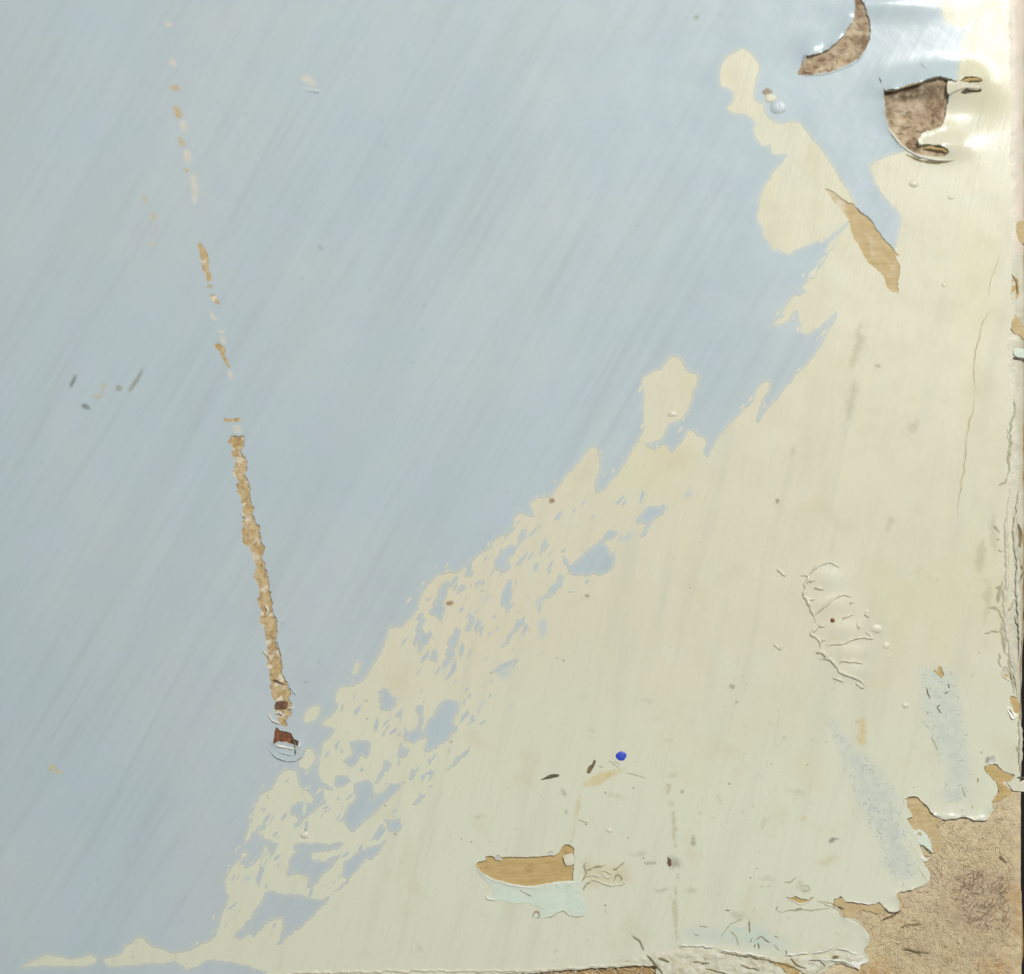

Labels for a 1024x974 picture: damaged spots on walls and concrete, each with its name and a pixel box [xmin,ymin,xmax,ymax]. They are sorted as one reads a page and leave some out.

spalling [798,0,871,76]
spalling [879,63,981,164]
peeling [720,49,900,293]
peeling [1011,274,1019,298]
peeling [1011,315,1024,358]
peeling [195,484,695,946]
peeling [1007,696,1019,719]
peeling [786,896,814,905]
peeling [820,755,1024,974]
spalling [522,965,657,974]